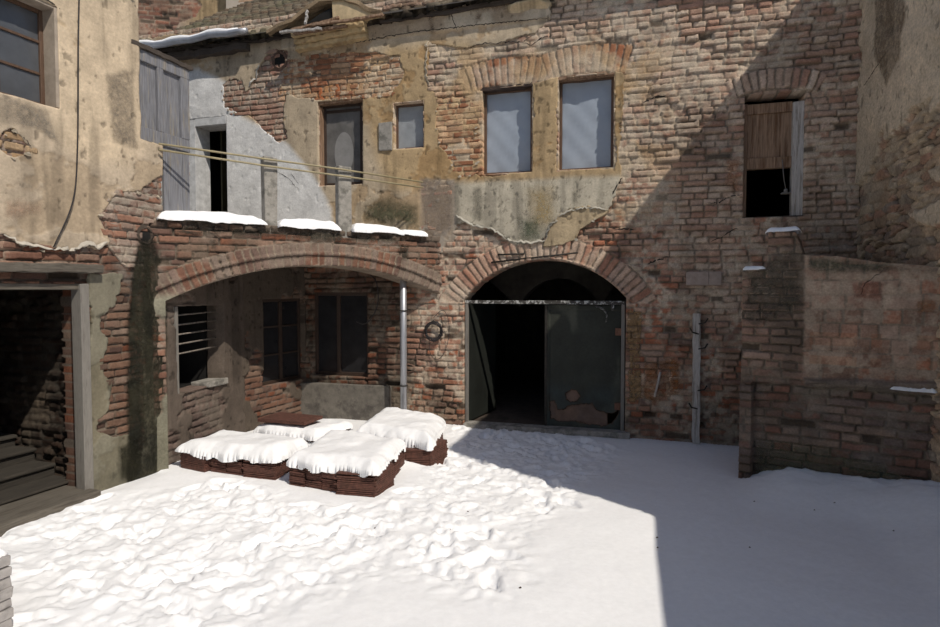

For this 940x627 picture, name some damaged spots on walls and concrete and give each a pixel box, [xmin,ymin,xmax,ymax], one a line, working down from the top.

flaking render [221,48,404,143]
flaking render [0,189,163,267]
flaking render [456,205,609,248]
flaking render [97,282,146,439]